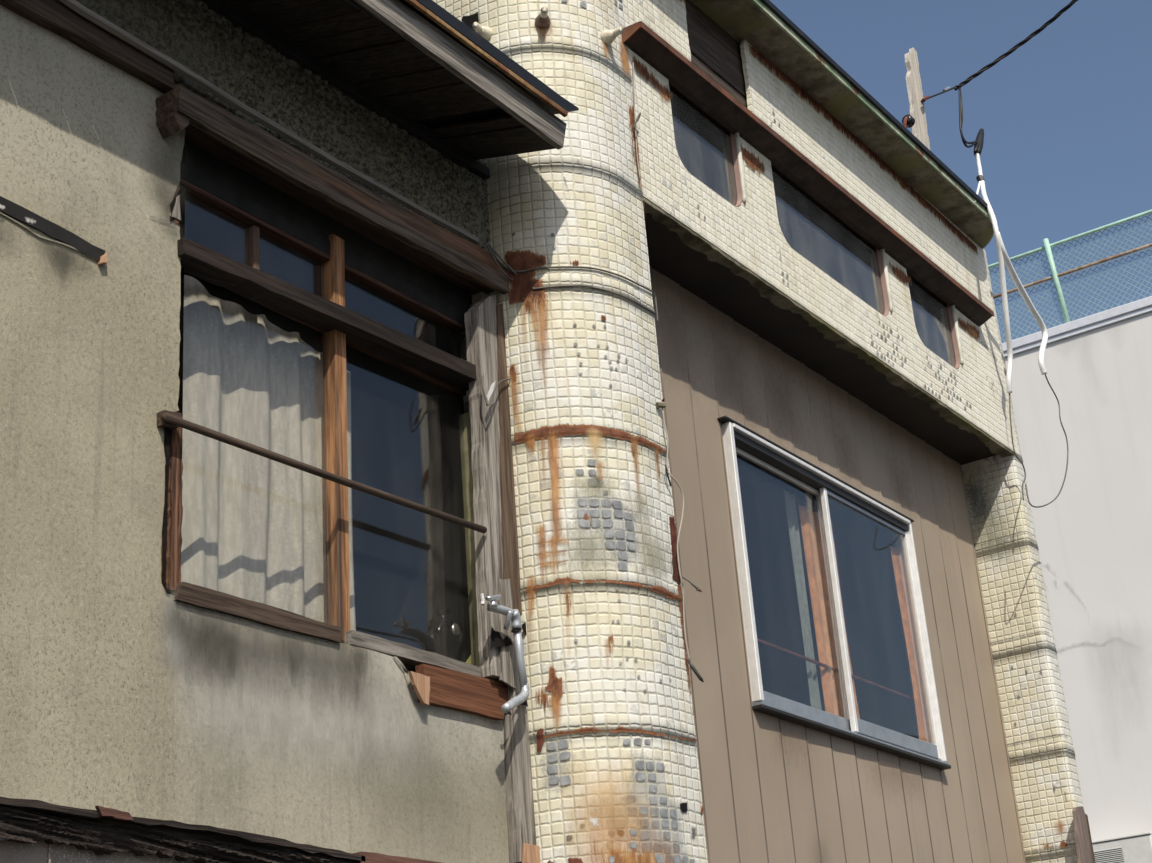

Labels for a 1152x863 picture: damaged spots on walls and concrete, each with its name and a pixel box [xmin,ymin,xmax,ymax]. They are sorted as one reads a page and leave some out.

corrosion [621,44,676,99]
corrosion [629,106,645,208]
corrosion [741,144,765,174]
corrosion [750,44,978,254]
corrosion [505,250,548,353]
corrosion [514,423,667,566]
corrosion [526,516,691,694]
spalling [393,656,422,707]
corrosion [535,666,695,752]
corrosion [590,788,661,863]